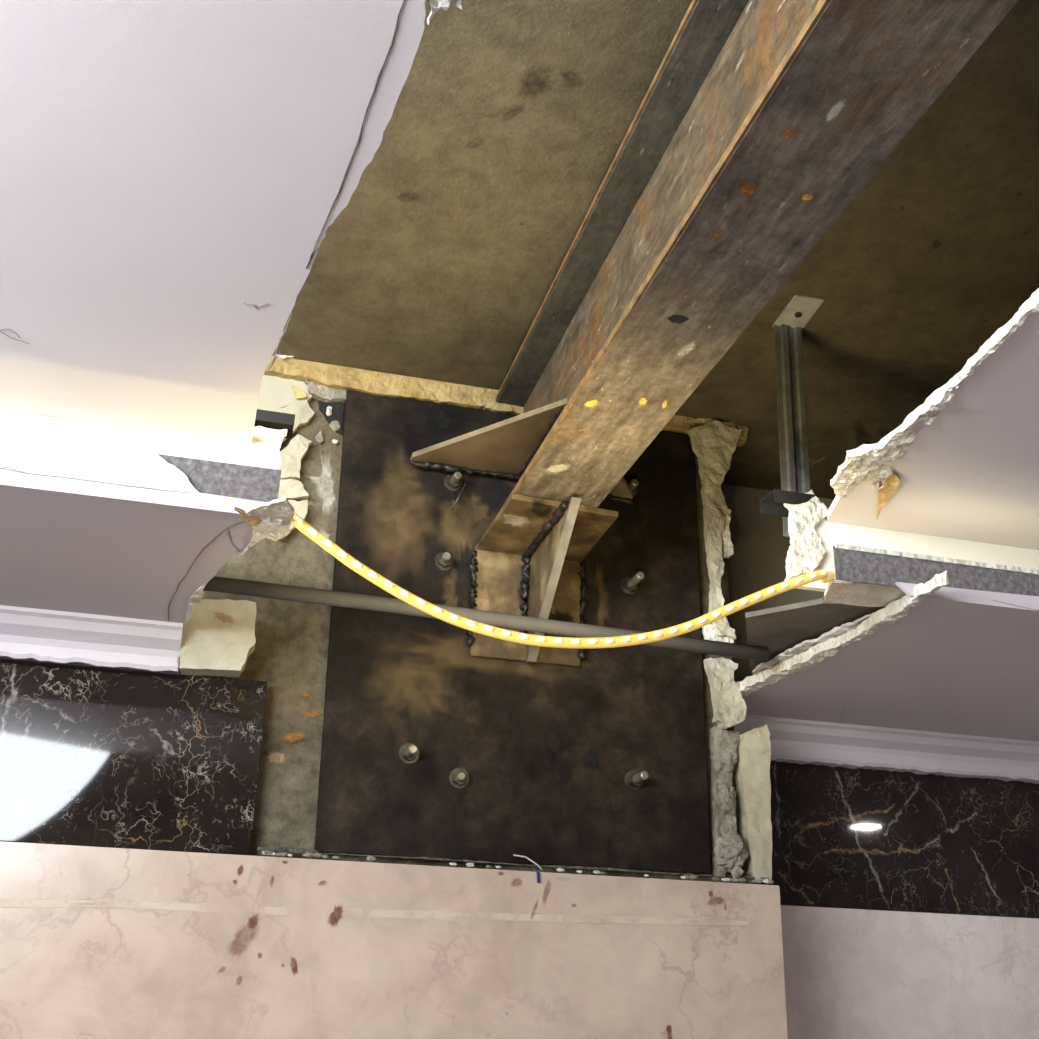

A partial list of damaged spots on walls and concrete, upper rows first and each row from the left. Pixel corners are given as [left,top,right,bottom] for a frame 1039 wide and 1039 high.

flaking render [830,288,1039,520]
flaking render [179,584,257,677]
flaking render [235,381,949,879]